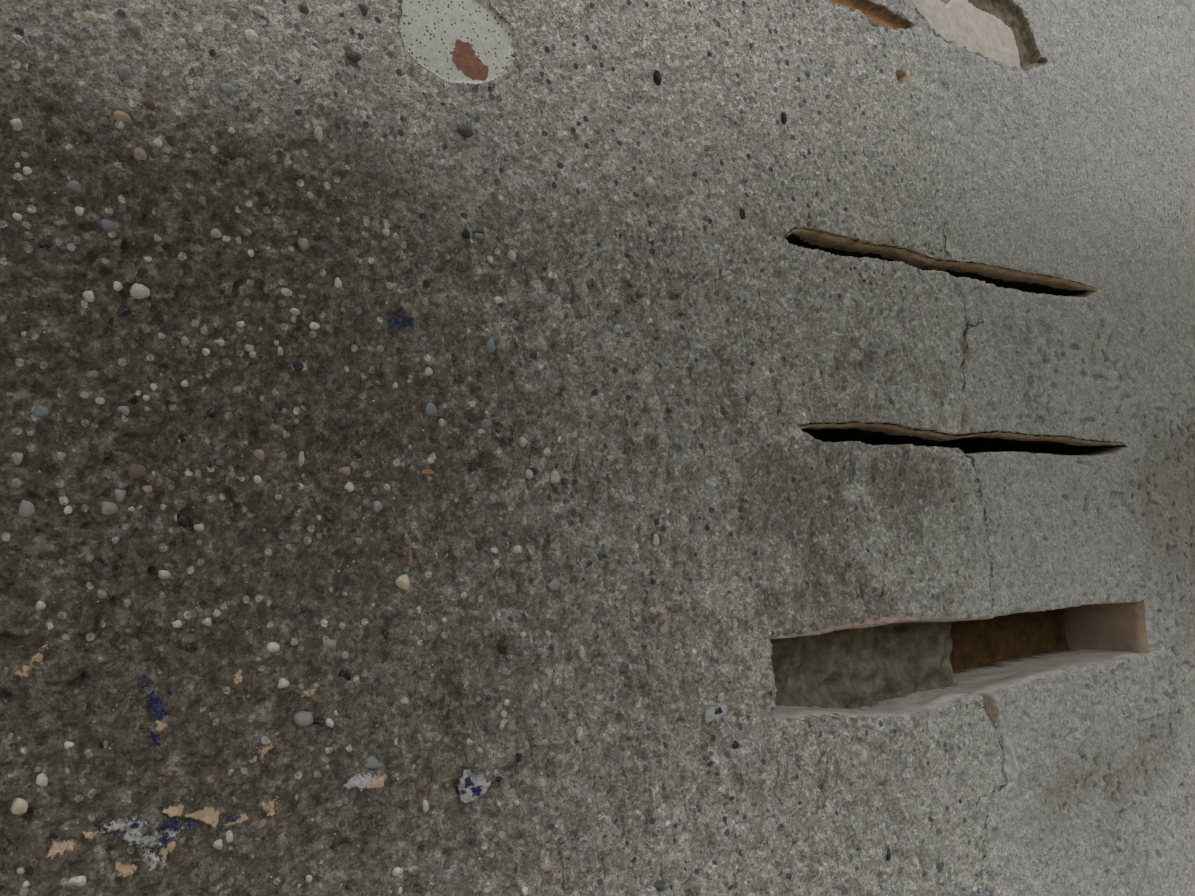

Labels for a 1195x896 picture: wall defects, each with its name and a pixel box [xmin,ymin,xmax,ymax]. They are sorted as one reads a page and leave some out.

flaking render [914,0,1048,71]
crack [960,303,984,389]
crack [965,454,986,520]
peeling [977,693,999,722]